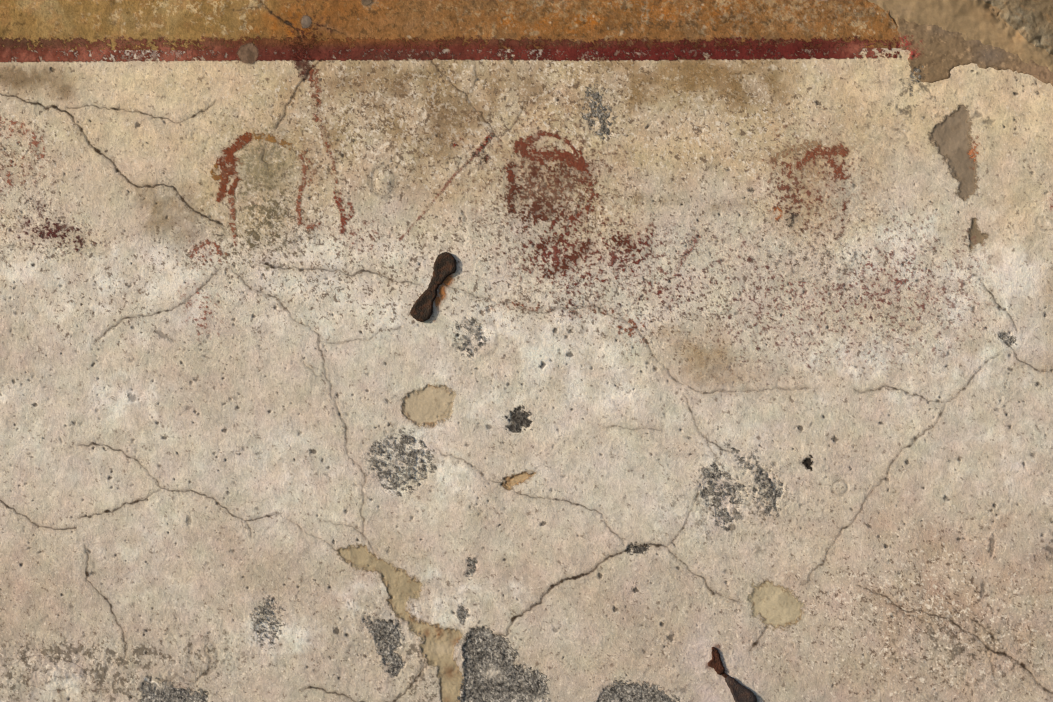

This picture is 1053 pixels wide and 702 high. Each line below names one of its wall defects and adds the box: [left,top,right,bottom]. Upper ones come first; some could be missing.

crack [267,8,302,42]
spalling [897,36,925,96]
crack [10,95,221,236]
corrosion [435,275,452,306]
crack [484,543,661,640]
crack [935,615,1047,691]